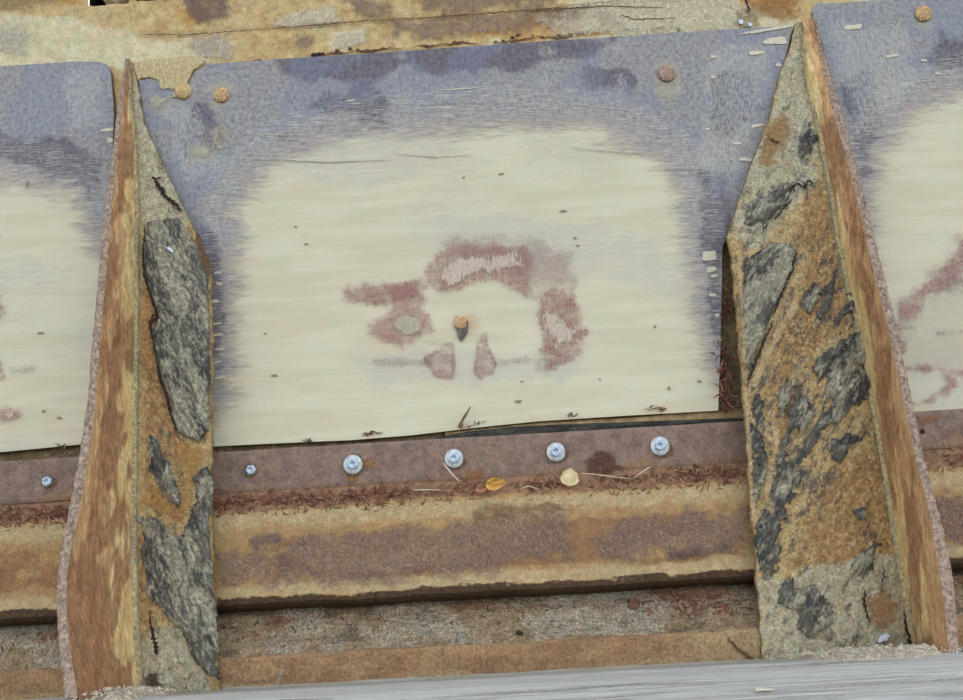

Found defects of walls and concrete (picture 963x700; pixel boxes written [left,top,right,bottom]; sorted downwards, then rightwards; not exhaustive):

rust [183,0,230,23]
rust [351,0,589,39]
rust [343,454,374,482]